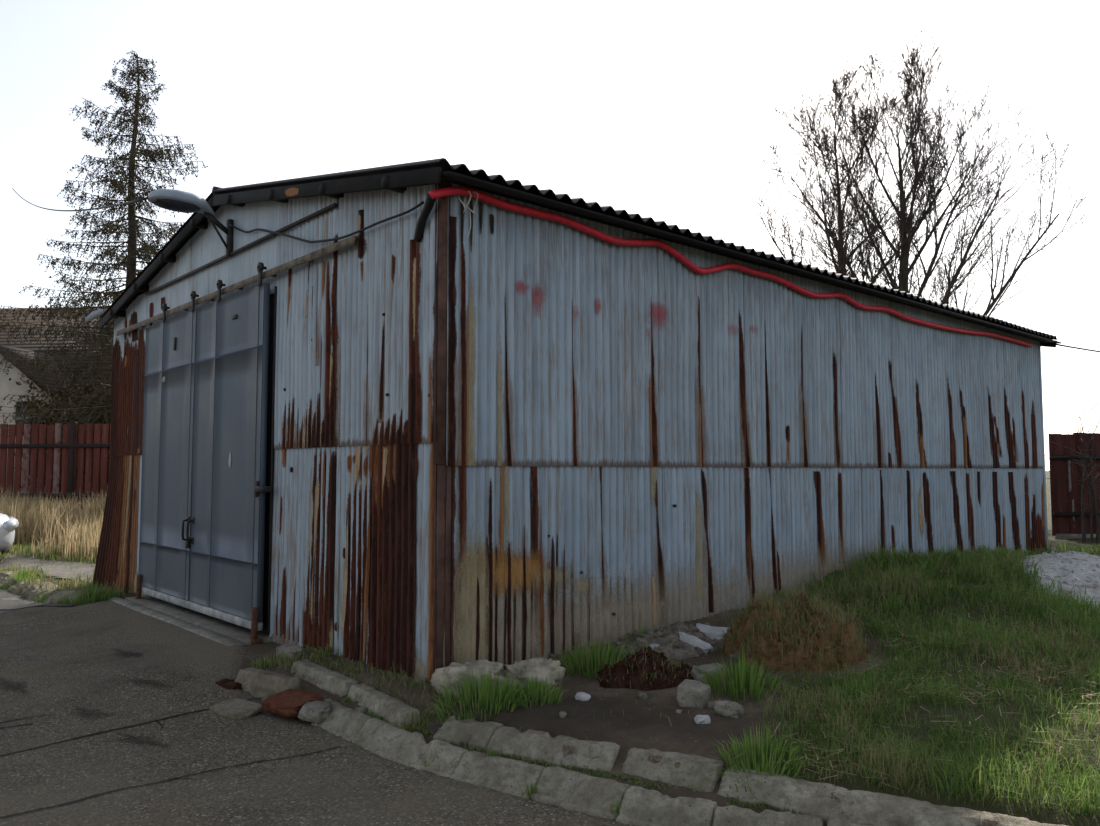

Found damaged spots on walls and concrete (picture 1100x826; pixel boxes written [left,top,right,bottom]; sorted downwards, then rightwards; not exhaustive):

rust [93,297,167,593]
rust [276,209,665,683]
rust [696,297,714,613]
rust [739,313,755,602]
rust [771,503,781,593]
rust [801,334,827,573]
rust [833,354,843,557]
rust [875,362,934,554]